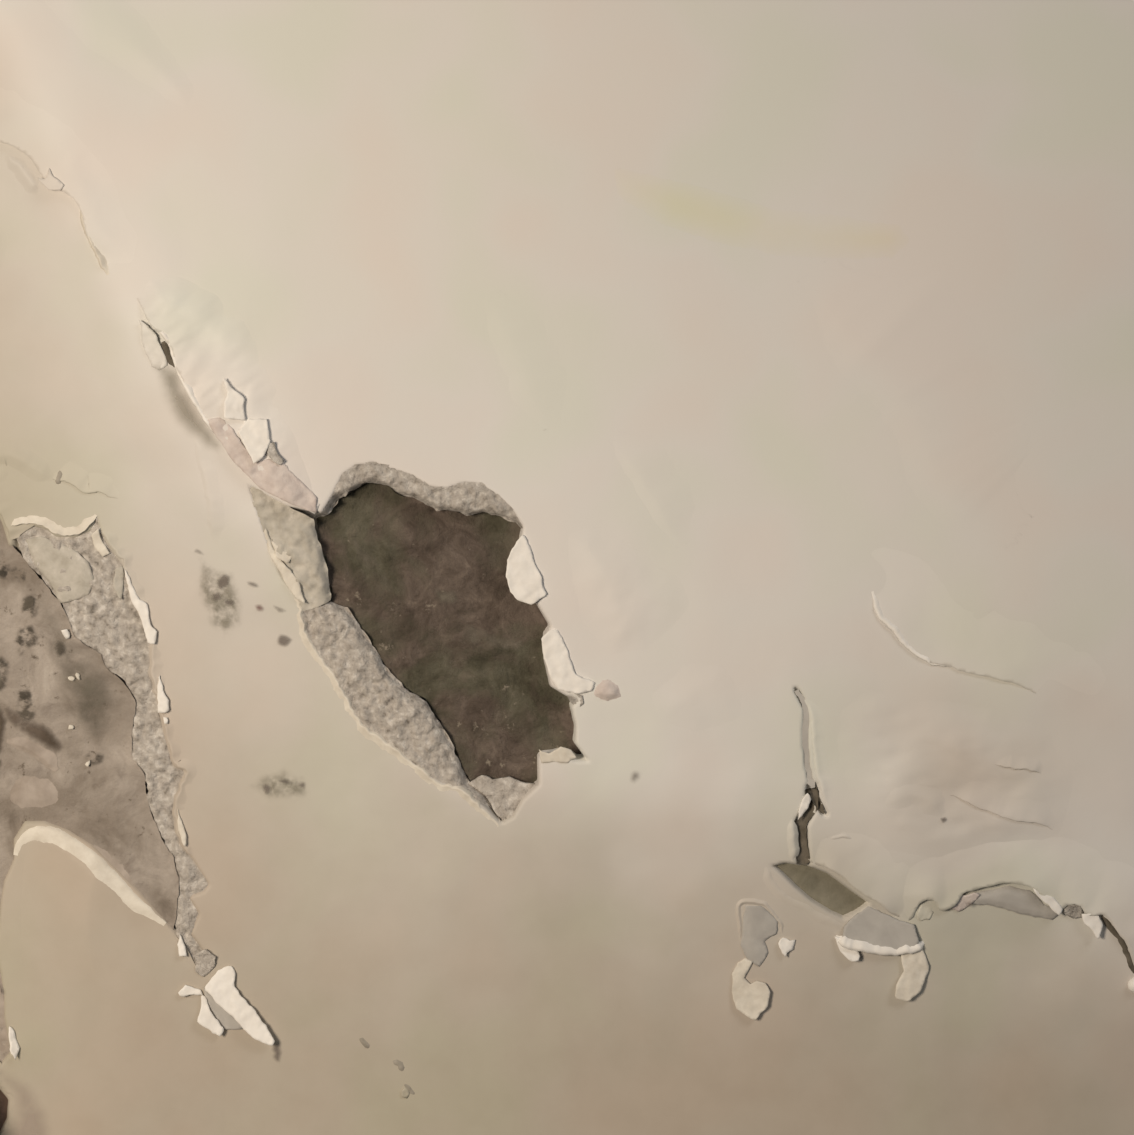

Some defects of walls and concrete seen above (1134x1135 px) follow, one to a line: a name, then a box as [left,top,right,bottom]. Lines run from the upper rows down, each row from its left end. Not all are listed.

flaking render [0,973,20,1135]
flaking render [0,464,279,1059]
spalling [137,277,621,827]
peeling [732,832,1134,1021]